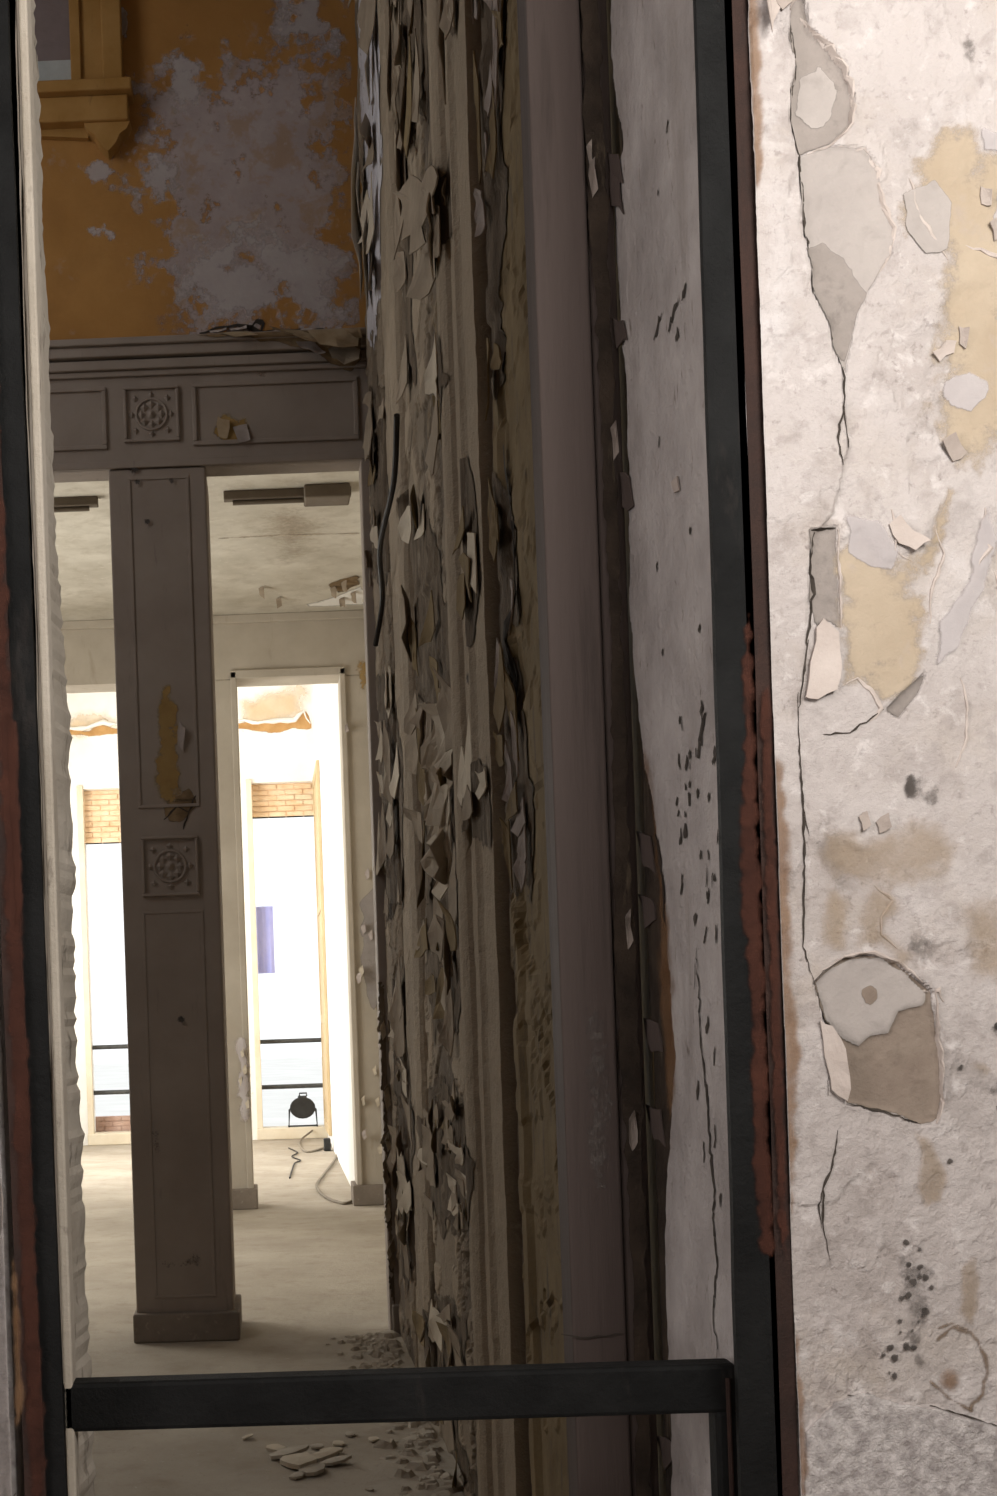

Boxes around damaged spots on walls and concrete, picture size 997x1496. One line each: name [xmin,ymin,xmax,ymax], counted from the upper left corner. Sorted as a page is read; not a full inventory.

crack [767,0,849,465]
peeling [789,0,997,466]
peeling [86,0,534,1367]
peeling [798,490,953,735]
spalling [814,885,945,1124]
peeling [437,1420,478,1496]